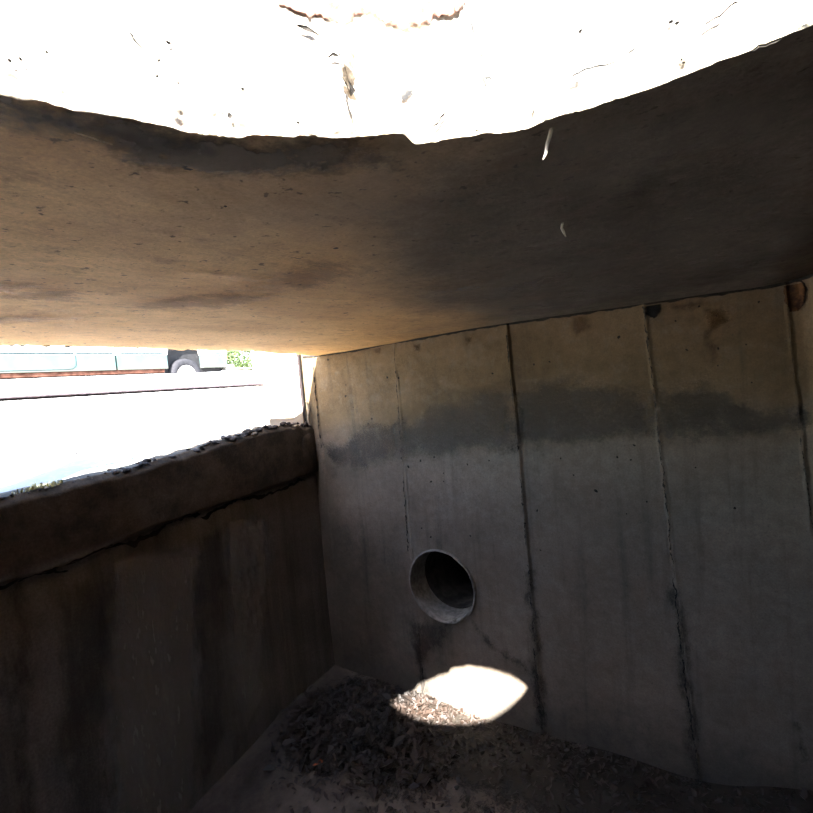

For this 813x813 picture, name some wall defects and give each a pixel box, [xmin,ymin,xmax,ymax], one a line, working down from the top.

peeling [277,0,465,30]
crack [703,1,740,26]
crack [297,22,356,120]
crack [569,41,636,80]
water stain [329,384,647,466]